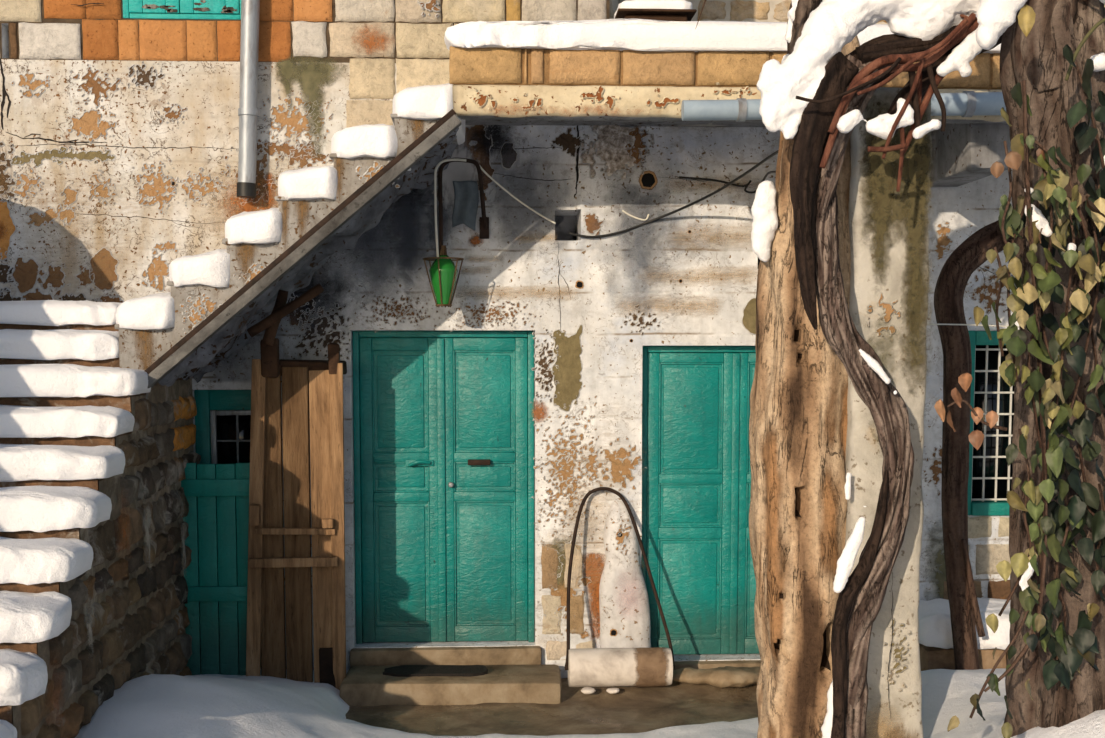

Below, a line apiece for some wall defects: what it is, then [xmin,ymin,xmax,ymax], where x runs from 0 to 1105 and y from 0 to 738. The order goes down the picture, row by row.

flaking render [0,60,188,303]
crack [0,58,235,150]
flaking render [132,89,333,214]
damp [413,119,423,140]
damp [360,144,478,275]
damp [496,156,552,242]
flaking render [233,263,266,285]
flaking render [280,289,646,639]